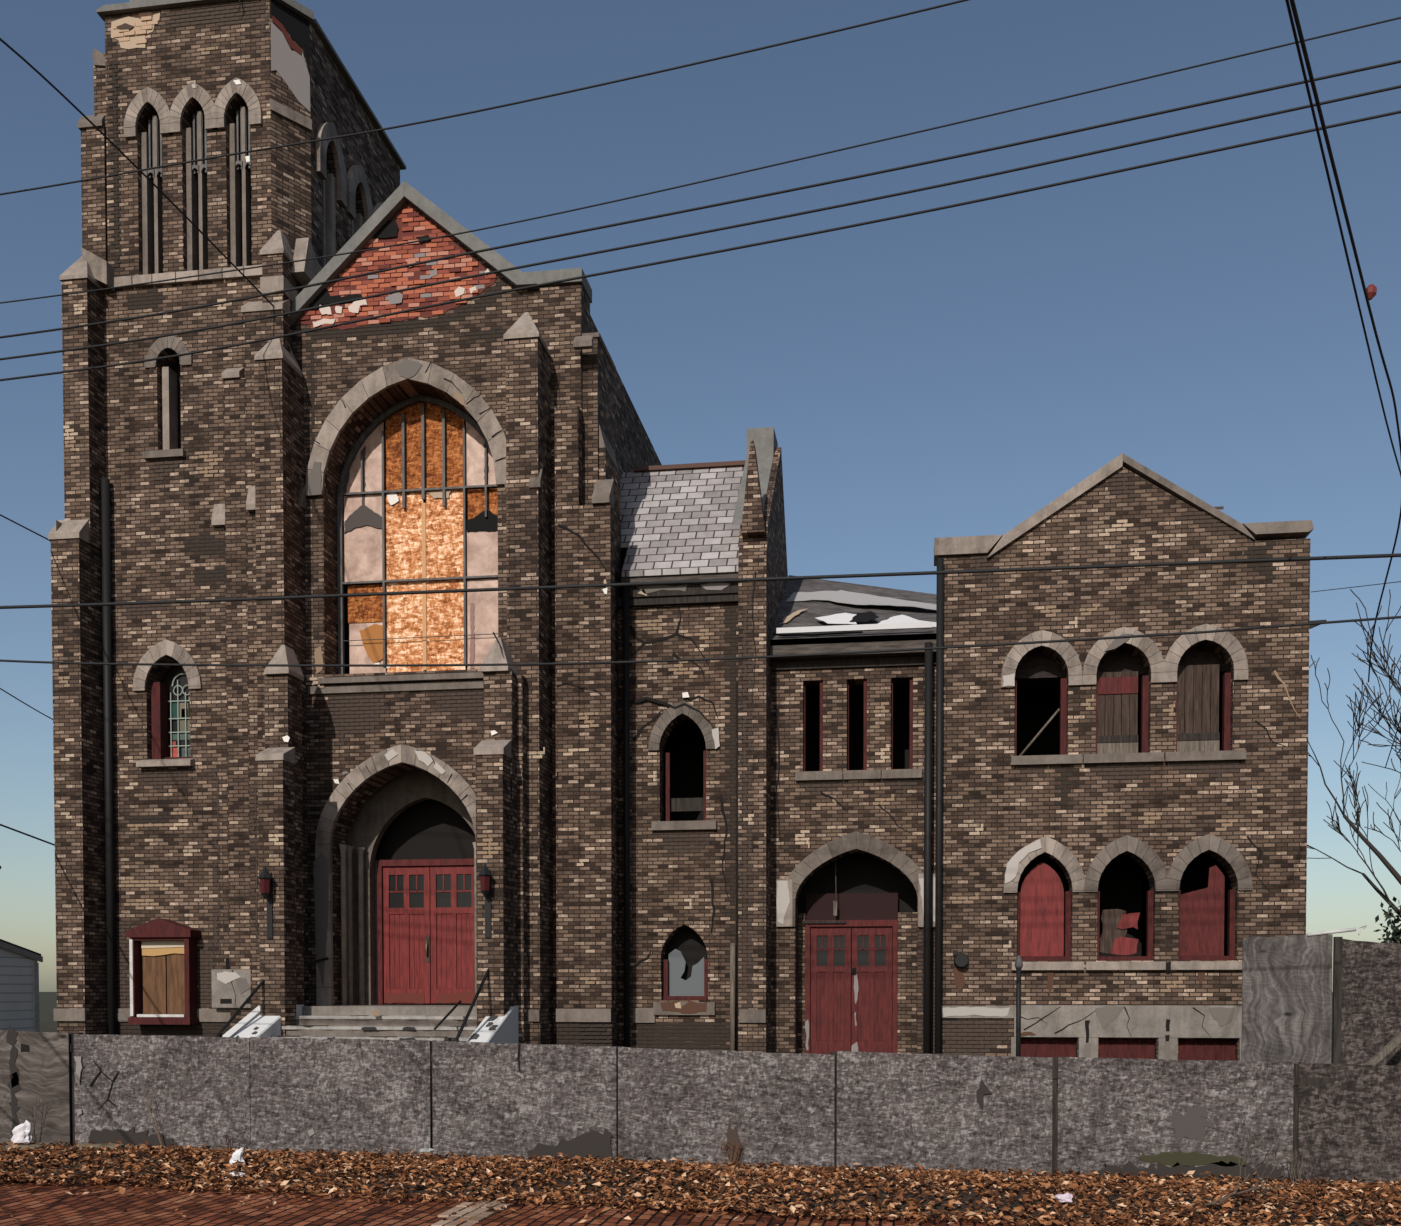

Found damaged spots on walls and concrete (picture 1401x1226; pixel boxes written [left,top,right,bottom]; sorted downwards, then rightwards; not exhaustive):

spalling [111,13,160,49]
spalling [298,203,497,330]
crack [1021,1007,1131,1036]